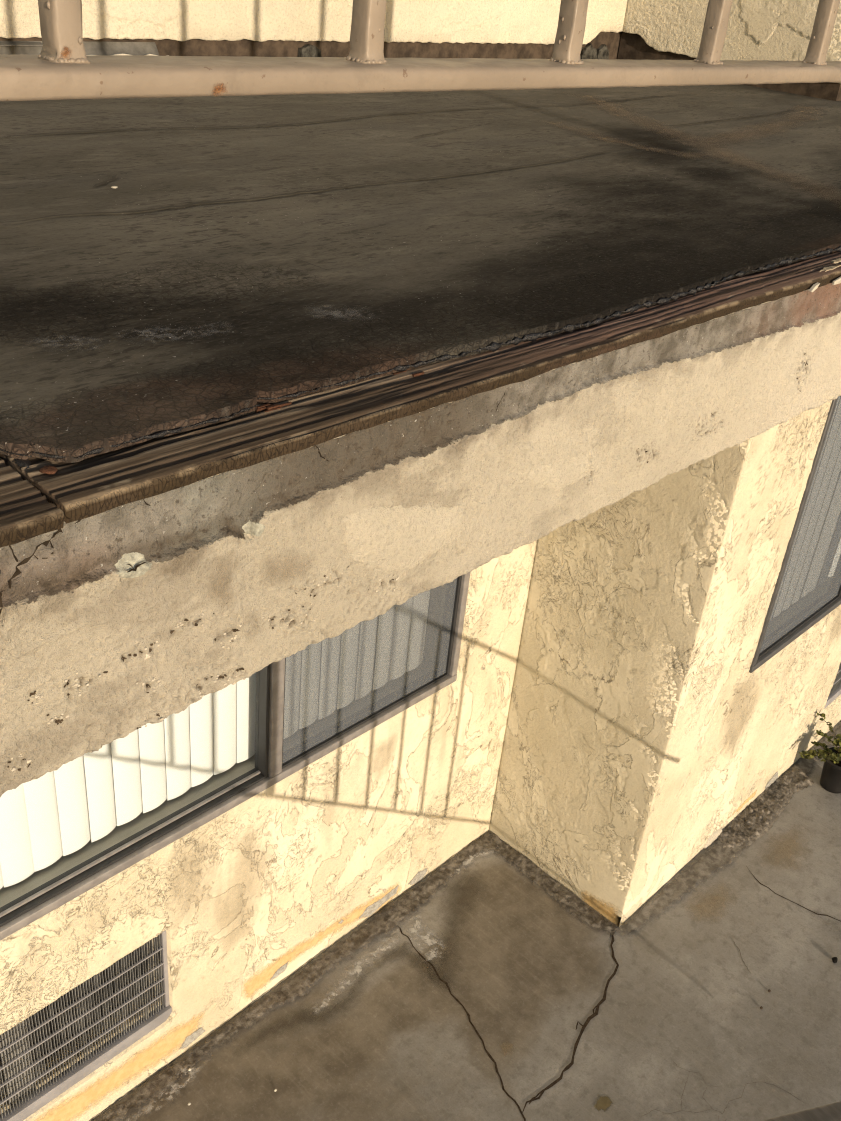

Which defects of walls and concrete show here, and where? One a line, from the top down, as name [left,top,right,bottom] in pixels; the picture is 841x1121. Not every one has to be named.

peeling [0,258,841,608]
crack [0,519,82,614]
spalling [261,566,351,629]
crack [747,867,840,921]
leakage [294,916,446,1022]
crack [398,926,619,1121]